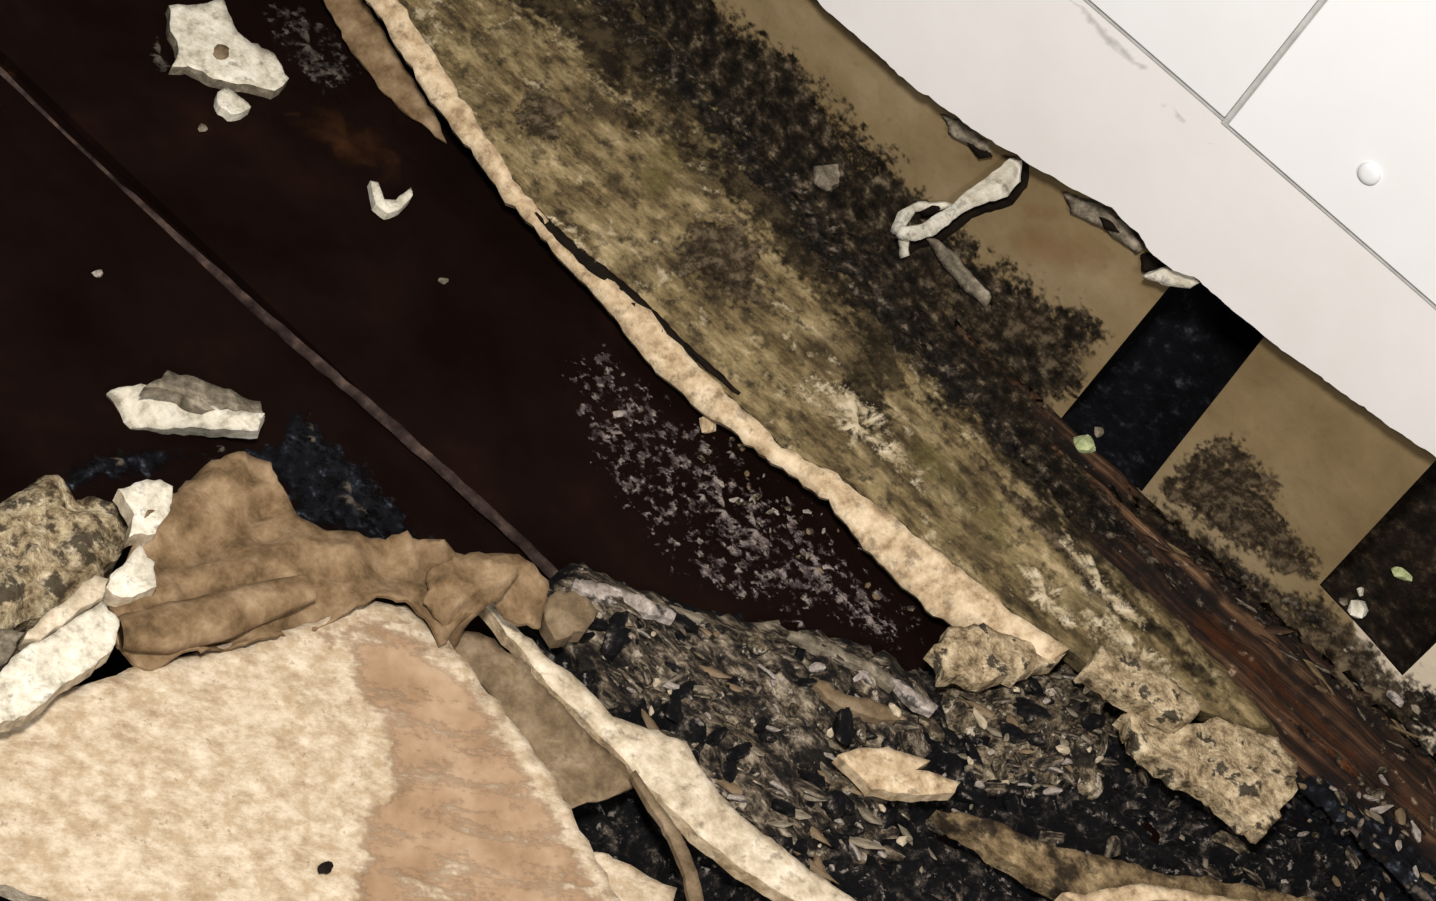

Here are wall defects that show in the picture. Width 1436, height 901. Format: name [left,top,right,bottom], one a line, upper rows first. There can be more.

leakage [497,0,1436,771]
spalling [1064,192,1200,288]